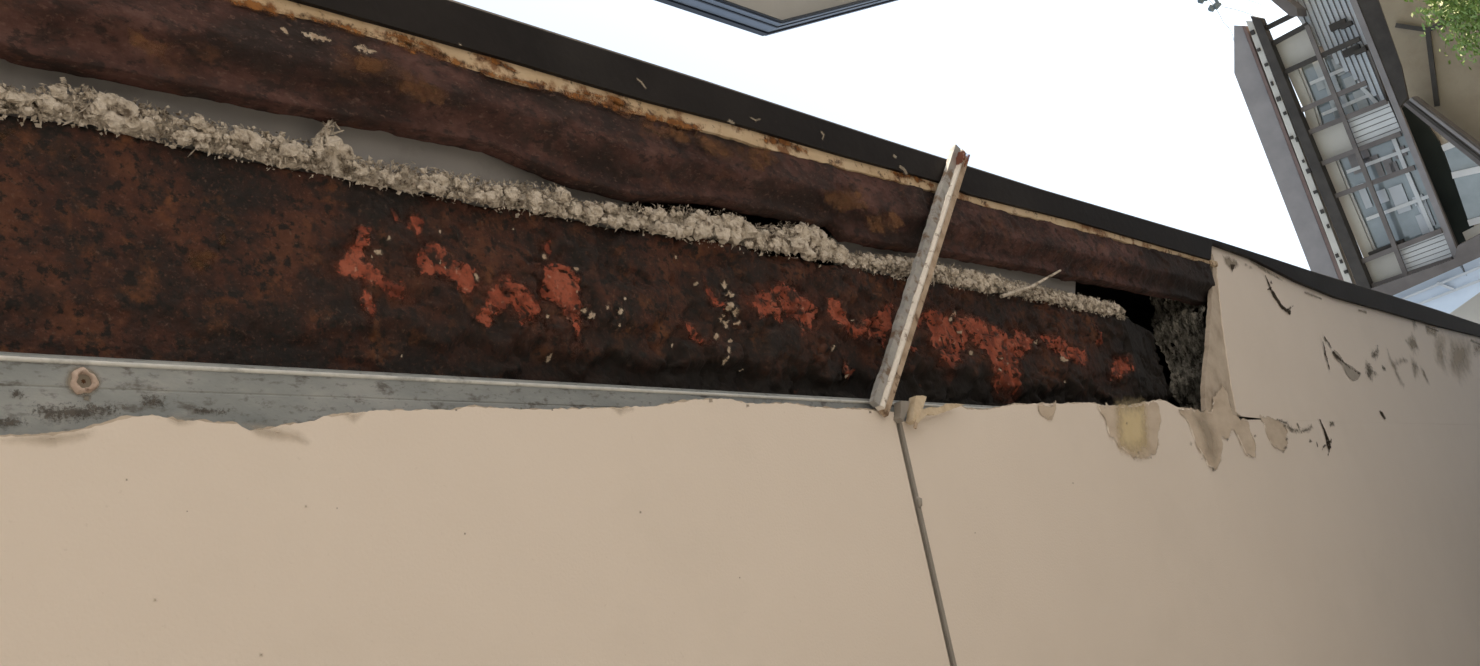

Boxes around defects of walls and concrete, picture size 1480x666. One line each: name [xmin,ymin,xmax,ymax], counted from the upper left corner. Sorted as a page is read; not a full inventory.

corrosion [230,0,808,171]
corrosion [956,151,970,167]
spalling [1334,350,1361,381]
corrosion [0,368,116,426]
peeling [1096,402,1161,459]
peeling [1179,383,1288,471]